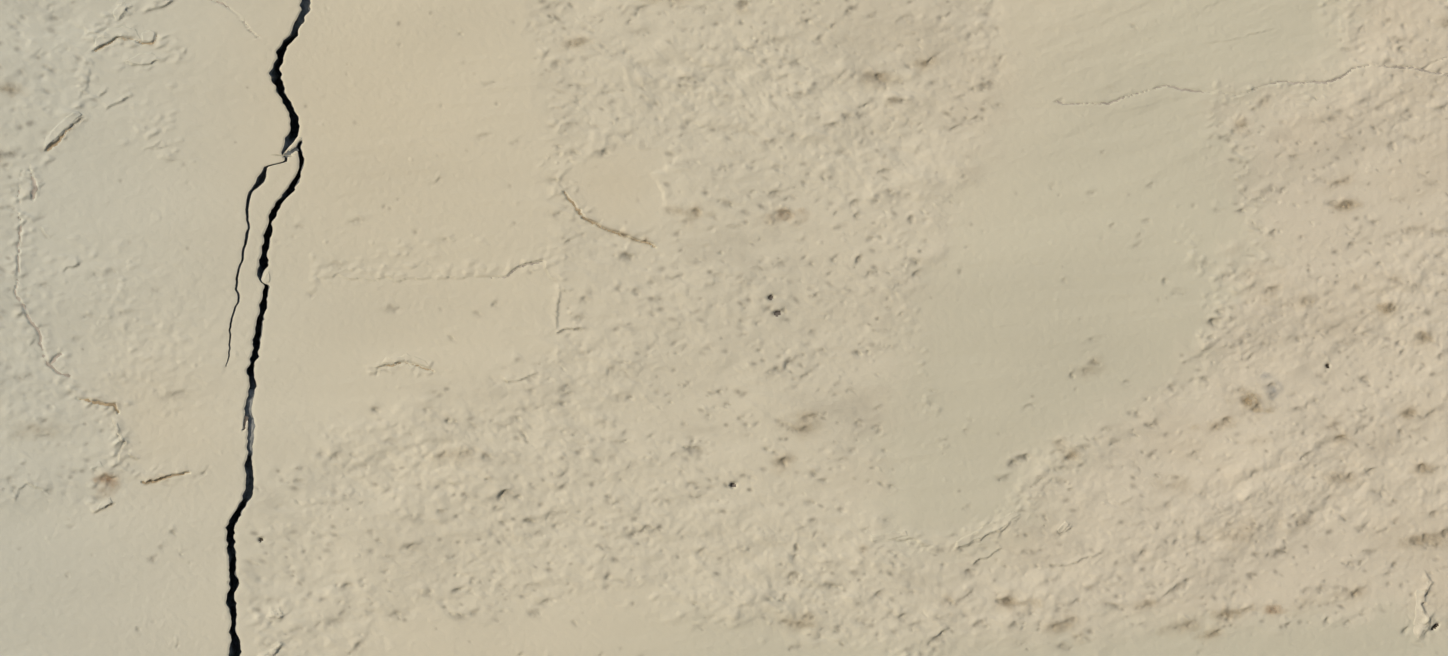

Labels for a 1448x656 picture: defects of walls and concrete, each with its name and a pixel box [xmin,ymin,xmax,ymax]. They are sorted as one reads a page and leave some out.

crack [211,0,311,656]